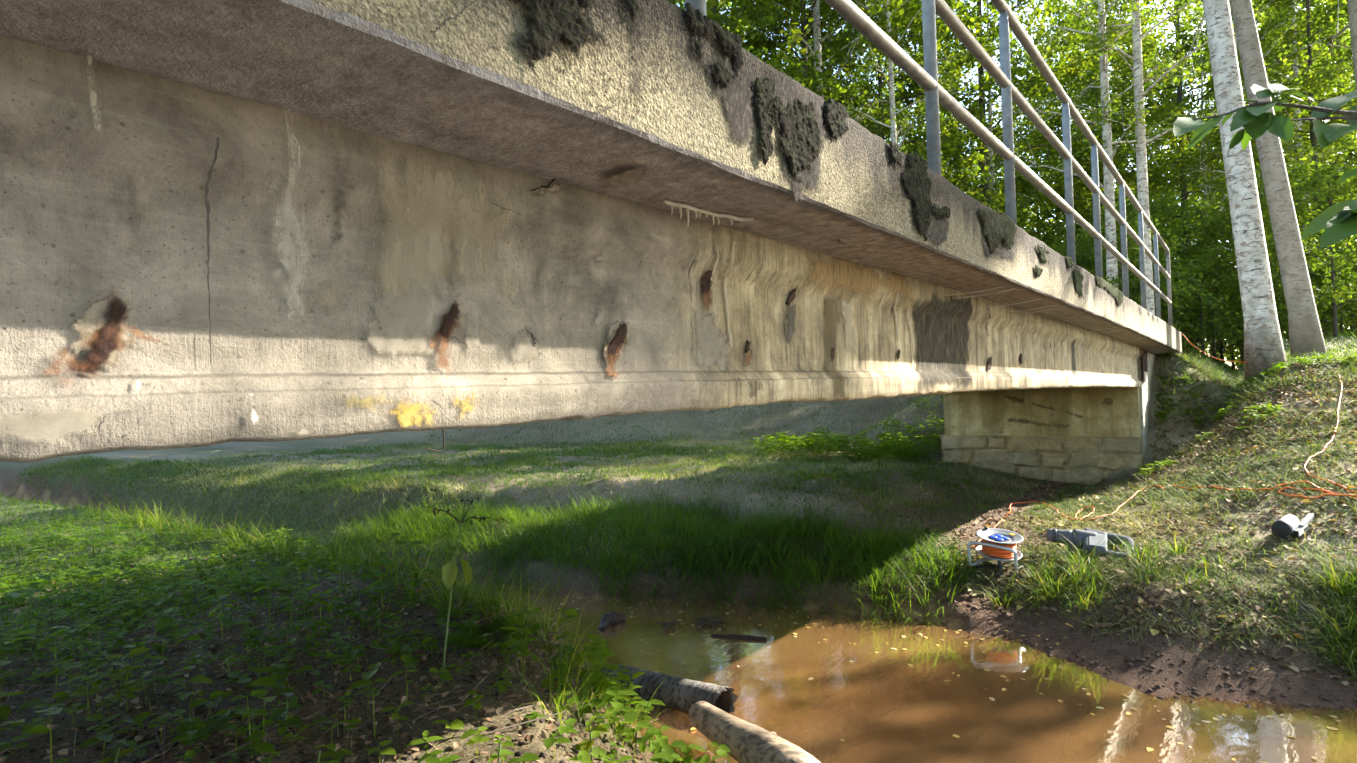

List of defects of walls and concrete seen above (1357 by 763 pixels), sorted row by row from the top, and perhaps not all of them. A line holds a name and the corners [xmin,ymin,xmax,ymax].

water stain [701,51,756,145]
water stain [771,74,825,201]
crack [204,137,219,374]
water stain [925,210,949,245]
water stain [982,237,1014,261]
water stain [879,291,991,390]
water stain [1071,340,1079,377]